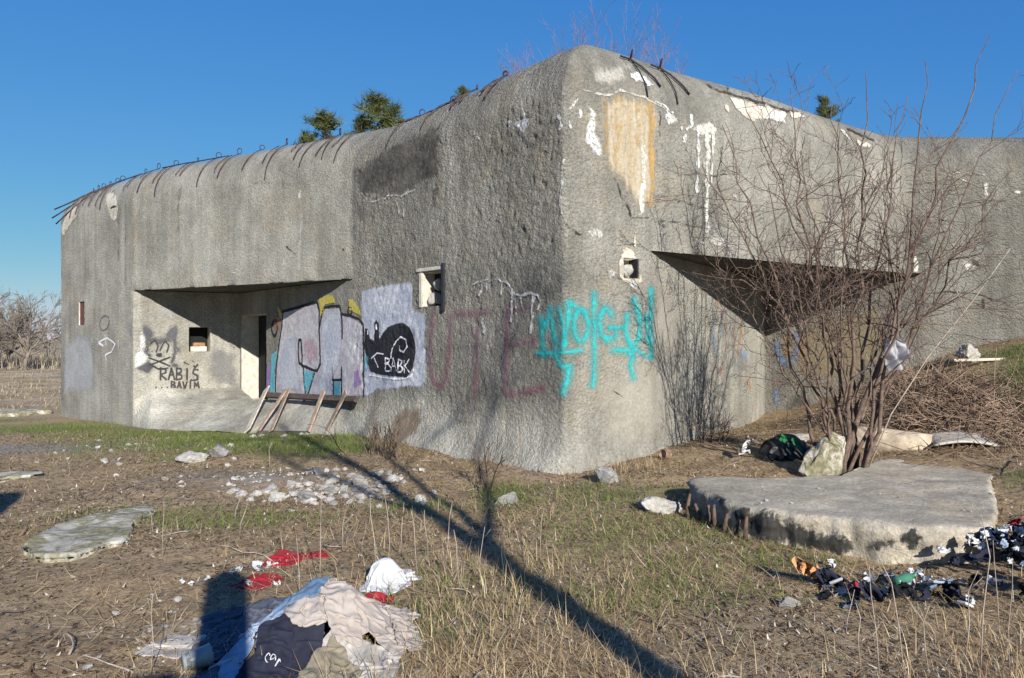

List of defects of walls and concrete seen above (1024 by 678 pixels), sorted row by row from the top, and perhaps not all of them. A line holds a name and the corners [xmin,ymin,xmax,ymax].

peeling [557,99,602,155]
rust [604,96,657,214]
water stain [584,66,735,247]
spalling [725,97,806,123]